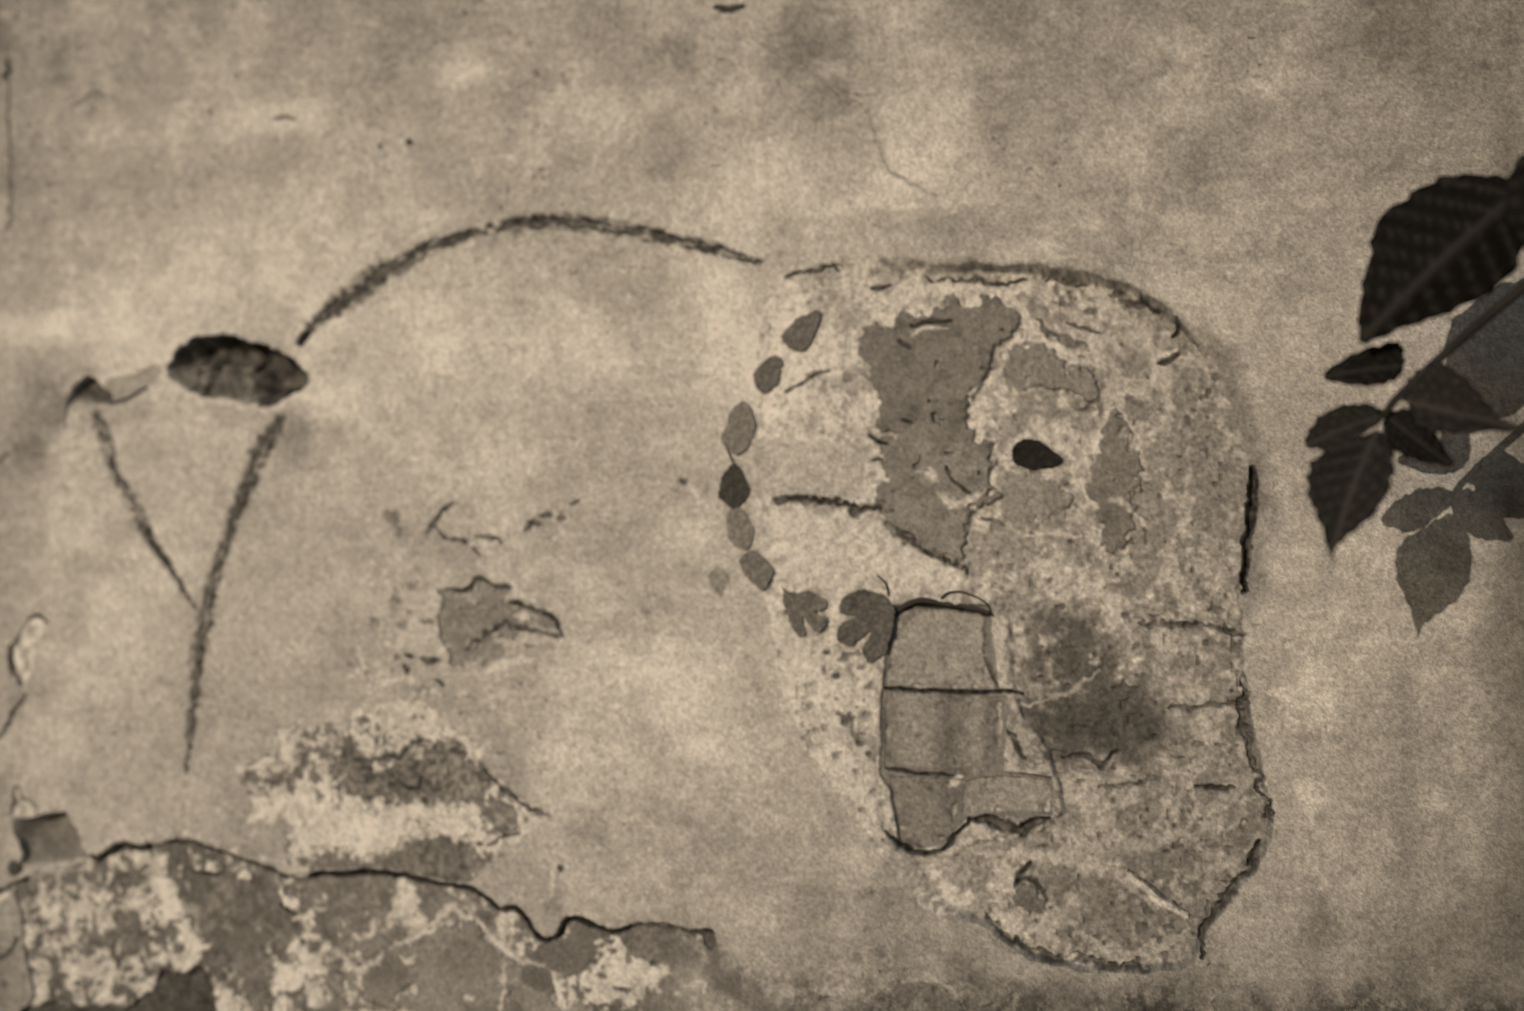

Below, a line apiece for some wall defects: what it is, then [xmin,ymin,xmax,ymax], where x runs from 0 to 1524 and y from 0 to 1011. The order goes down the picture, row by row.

spalling [713,2,747,16]
crack [759,42,940,200]
spalling [65,332,311,433]
spalling [0,612,51,742]
peeling [10,498,733,1011]
spalling [747,255,1279,981]